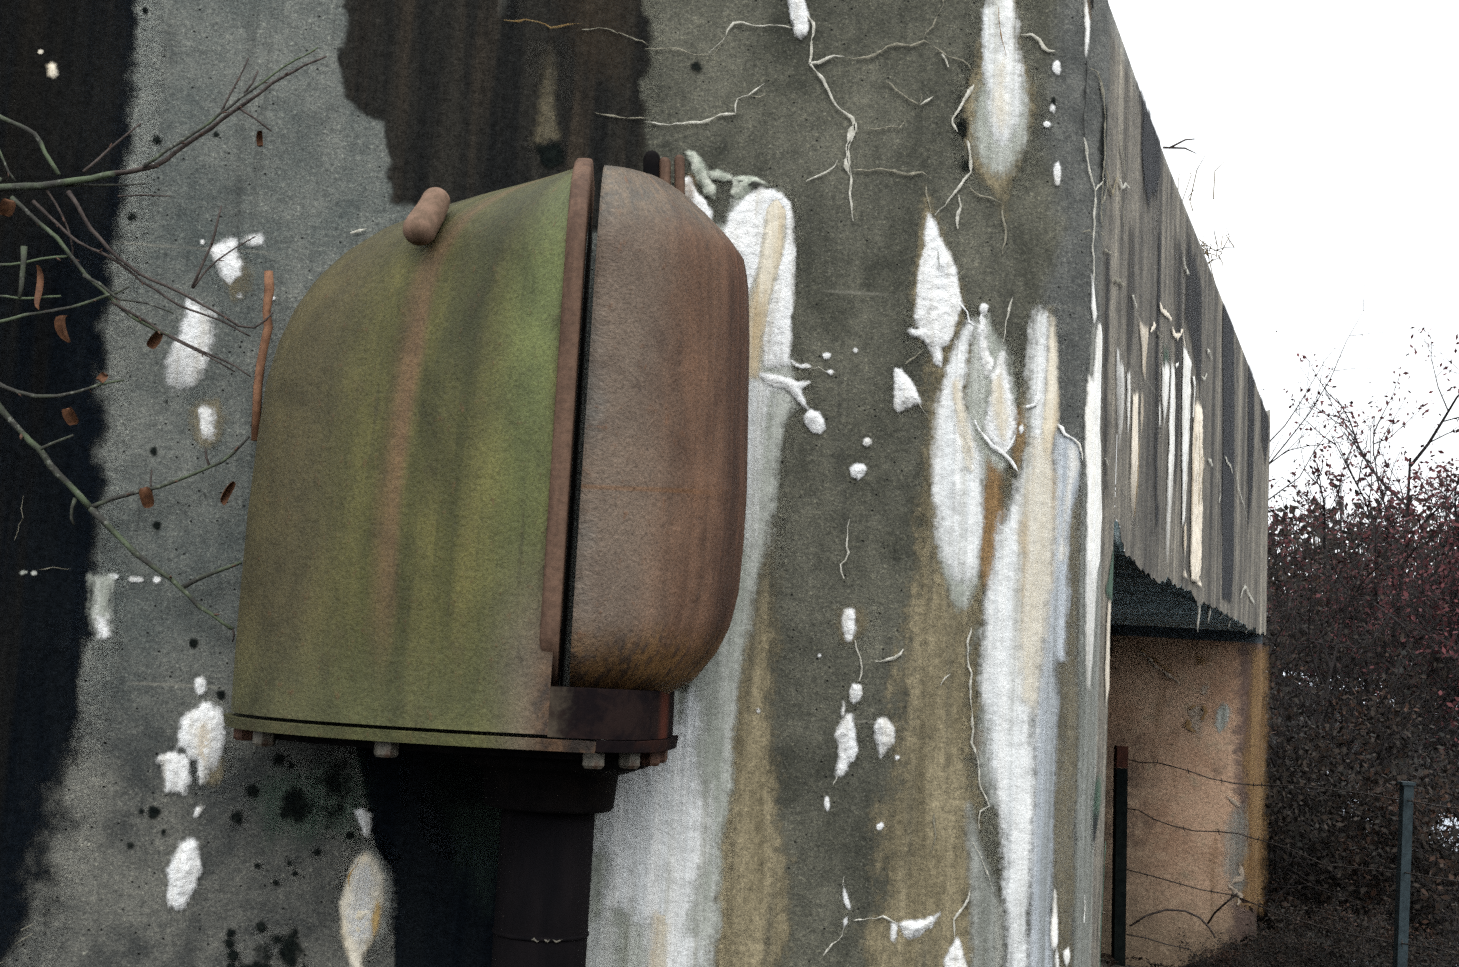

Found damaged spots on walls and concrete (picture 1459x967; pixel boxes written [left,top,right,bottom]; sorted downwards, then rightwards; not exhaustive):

water stain [338,0,651,230]
crack [582,0,1002,229]
water stain [964,0,1035,254]
water stain [0,0,161,963]
water stain [586,187,810,967]
water stain [864,186,1204,967]
peeling [157,690,225,794]
peeling [835,684,862,776]
peeling [167,839,201,909]
peeling [340,808,390,967]
crack [823,878,897,956]
crack [953,891,970,938]